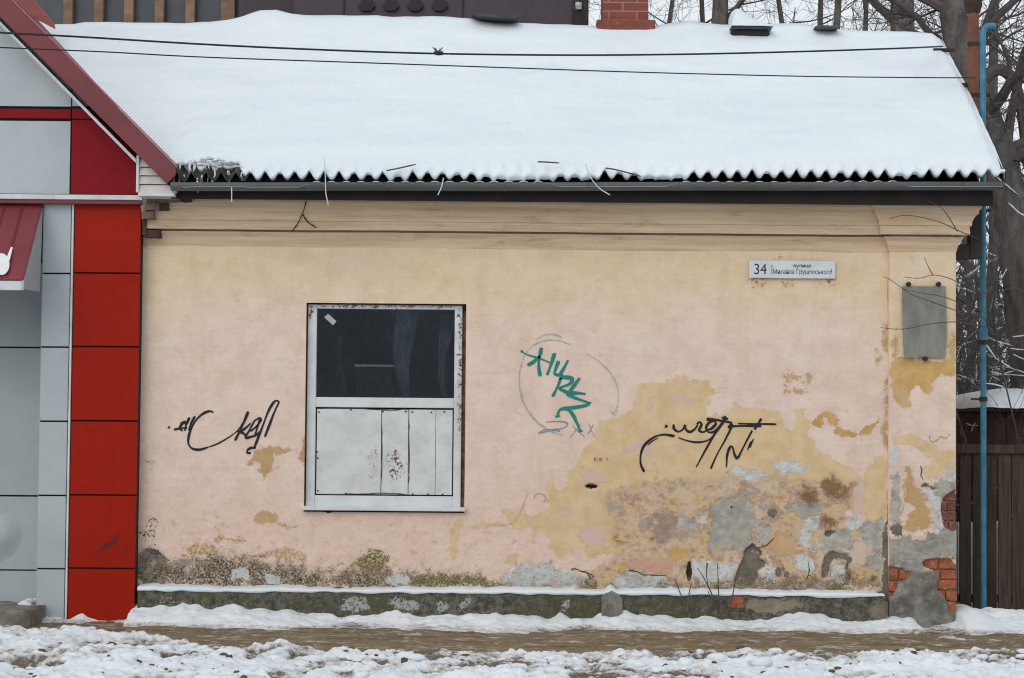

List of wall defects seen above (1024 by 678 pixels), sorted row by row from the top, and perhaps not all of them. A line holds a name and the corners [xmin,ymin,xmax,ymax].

peeling [783,370,812,395]
peeling [869,323,956,409]
peeling [247,445,298,486]
rust [321,407,410,495]
peeling [254,510,299,531]
peeling [449,375,957,628]
damp [138,538,885,592]